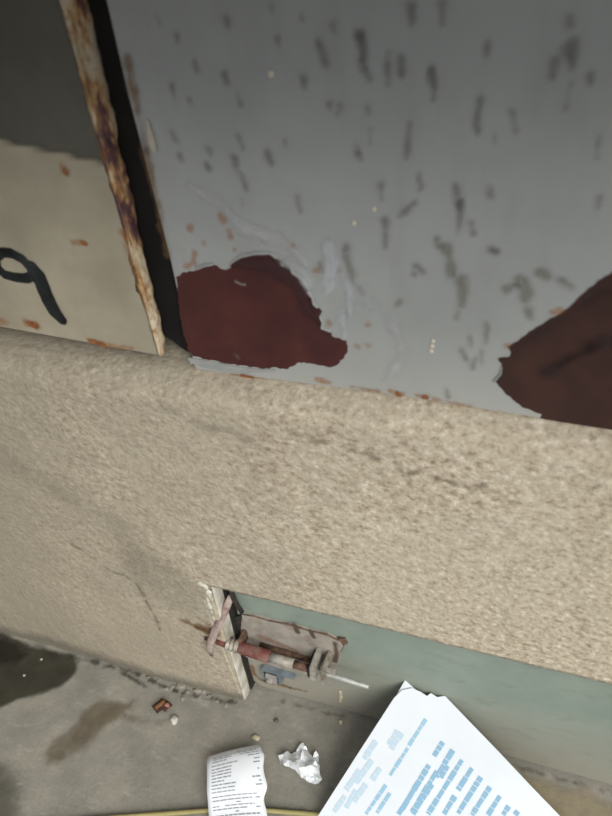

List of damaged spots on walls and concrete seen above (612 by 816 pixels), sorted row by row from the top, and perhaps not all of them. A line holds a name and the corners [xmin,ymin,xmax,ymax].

rust [59,0,166,356]
peeling [176,251,348,369]
peeling [492,273,612,430]
leakage [0,633,76,707]
rust [182,620,218,636]
leakage [50,704,125,759]